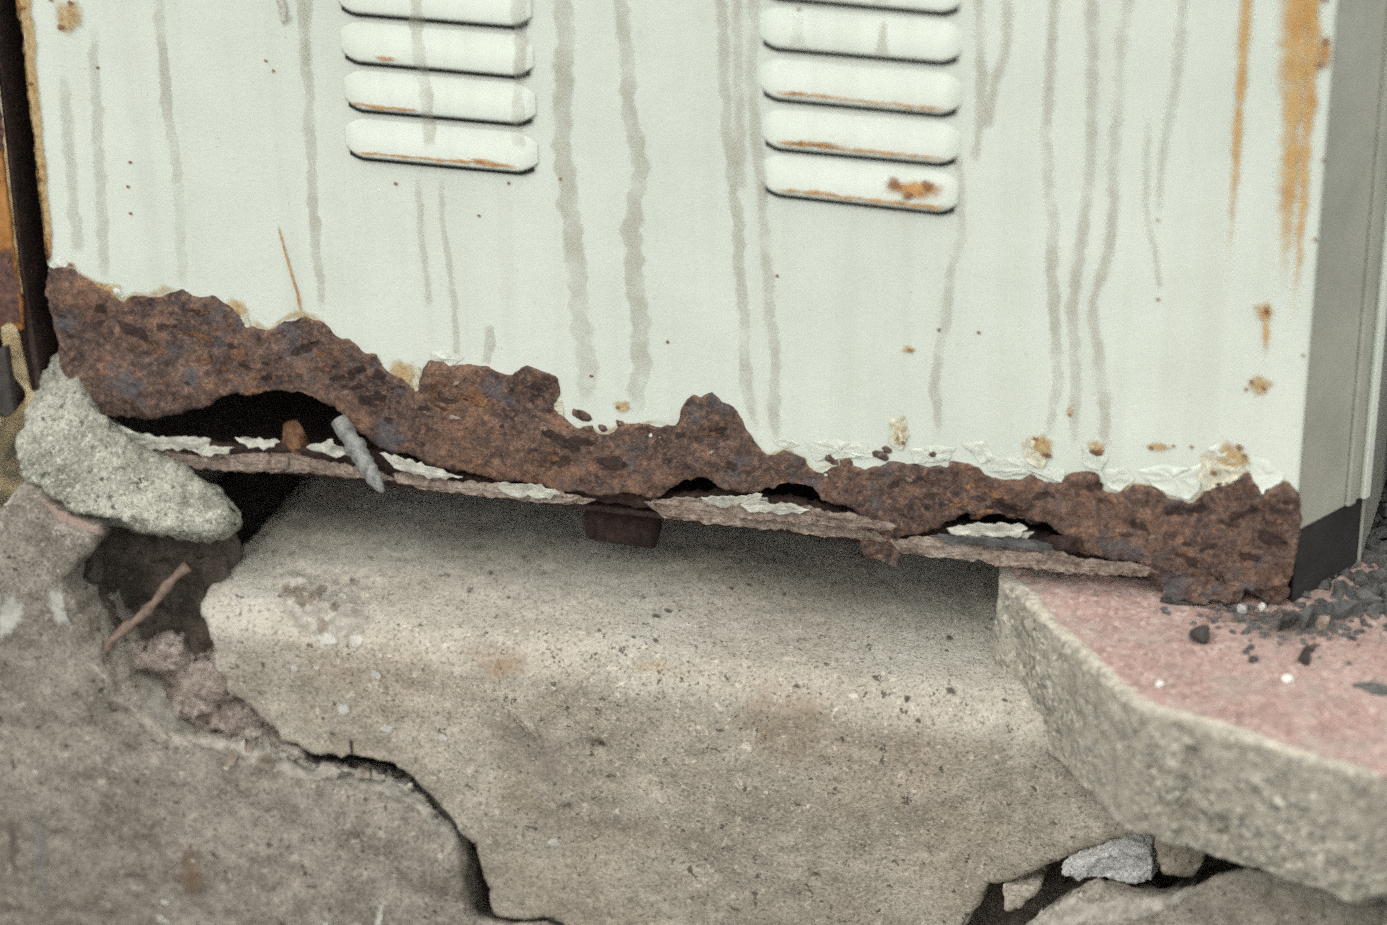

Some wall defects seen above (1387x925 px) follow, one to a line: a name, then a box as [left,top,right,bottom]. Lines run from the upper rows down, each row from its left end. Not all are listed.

water stain [158,48,169,87]
rust [1282,0,1330,262]
rust [0,250,21,324]
rust [17,0,1302,605]
water stain [1048,190,1116,332]
peeling [773,435,876,461]
peeling [889,416,1065,483]
peeling [1081,440,1284,499]
crack [102,493,245,662]
crack [305,740,457,828]
crack [974,856,1101,925]
crack [1153,853,1248,888]